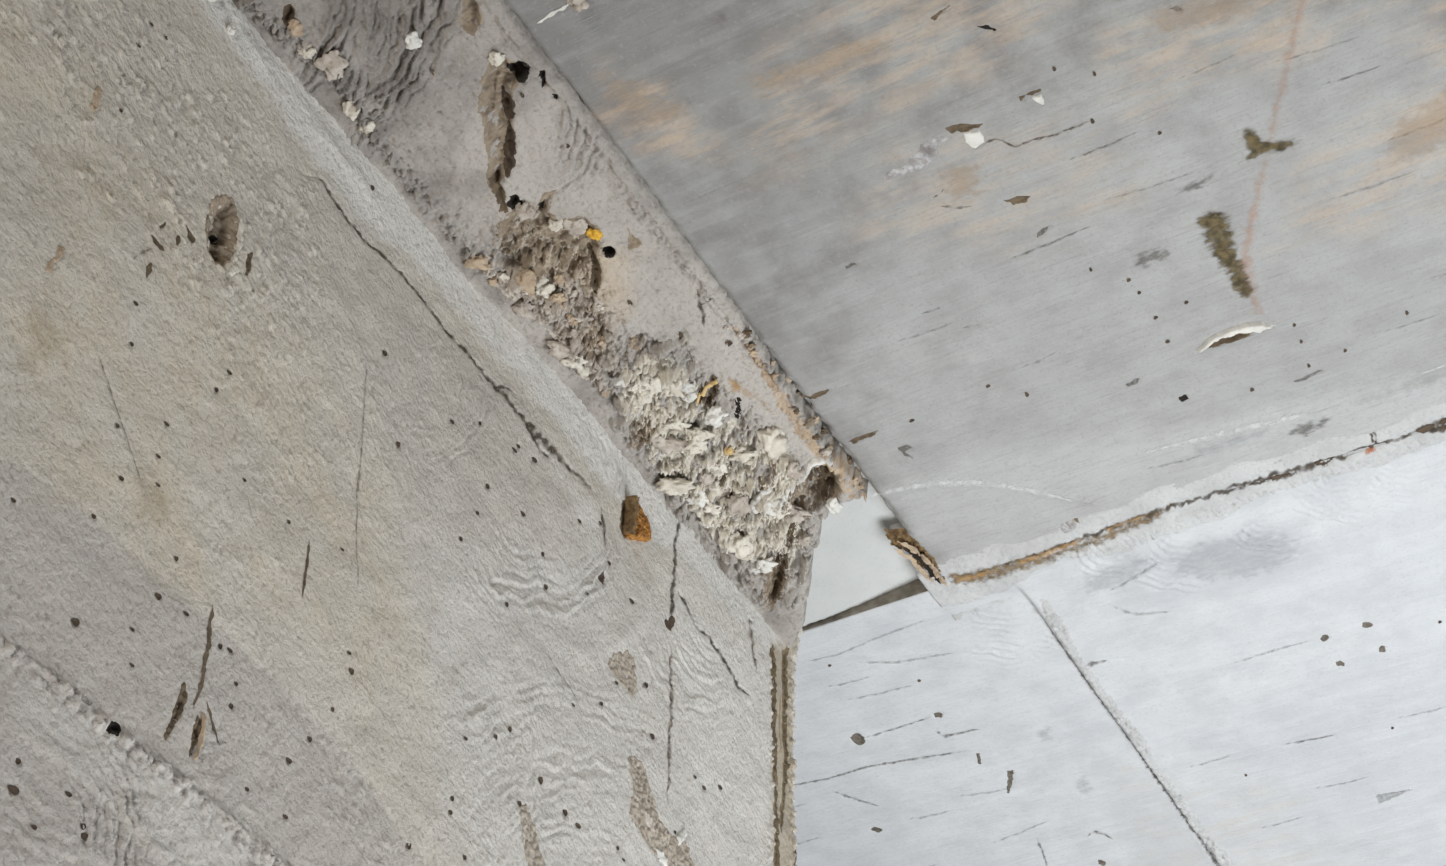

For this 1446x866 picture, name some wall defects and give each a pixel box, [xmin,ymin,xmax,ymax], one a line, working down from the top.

damp [1244,130,1293,160]
damp [1197,213,1254,298]
crack [319,179,584,481]
spalling [464,51,879,611]
crack [1007,418,1446,564]